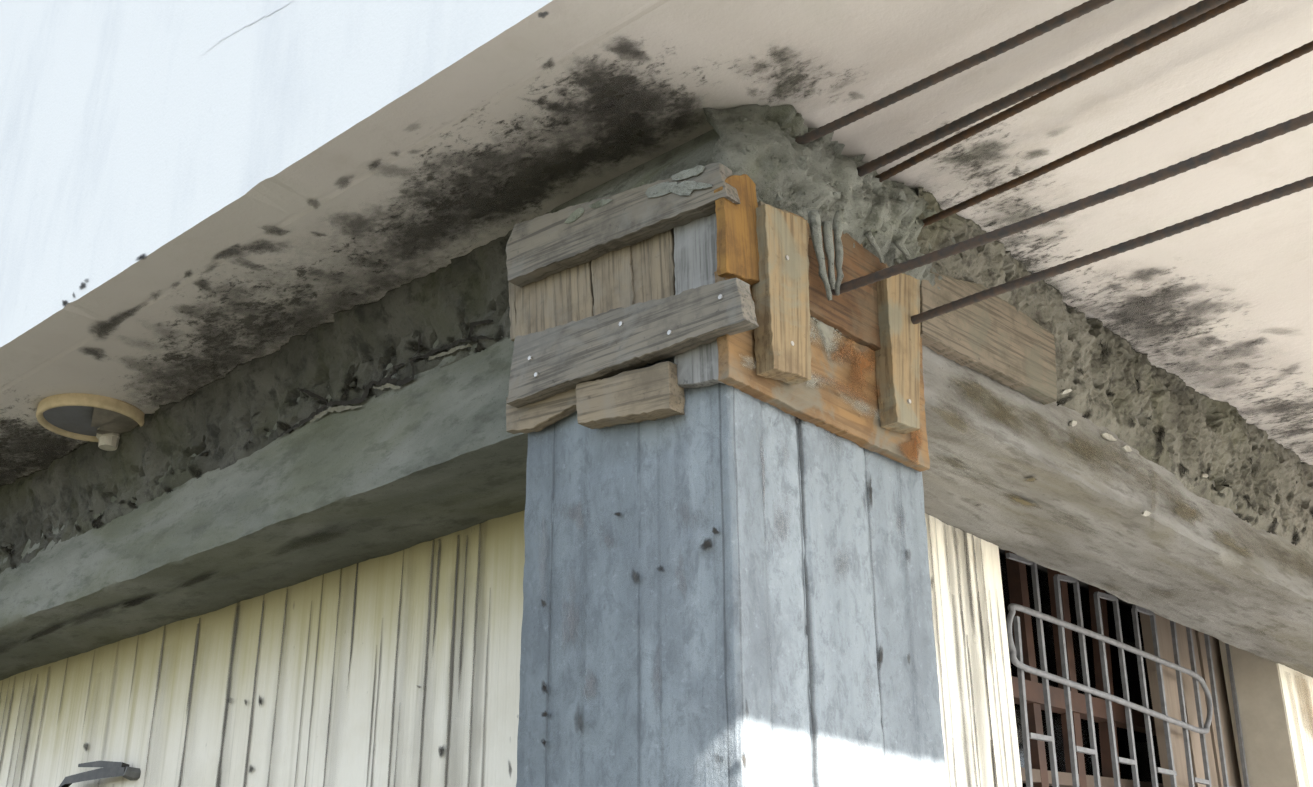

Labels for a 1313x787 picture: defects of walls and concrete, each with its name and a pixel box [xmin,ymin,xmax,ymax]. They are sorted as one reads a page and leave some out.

mould [334,42,698,273]
mould [934,132,1062,273]
mould [0,407,72,482]
mould [85,311,134,359]
mould [142,227,317,399]
spalling [0,229,513,574]
spalling [831,41,1313,555]
leakage [1071,271,1313,461]